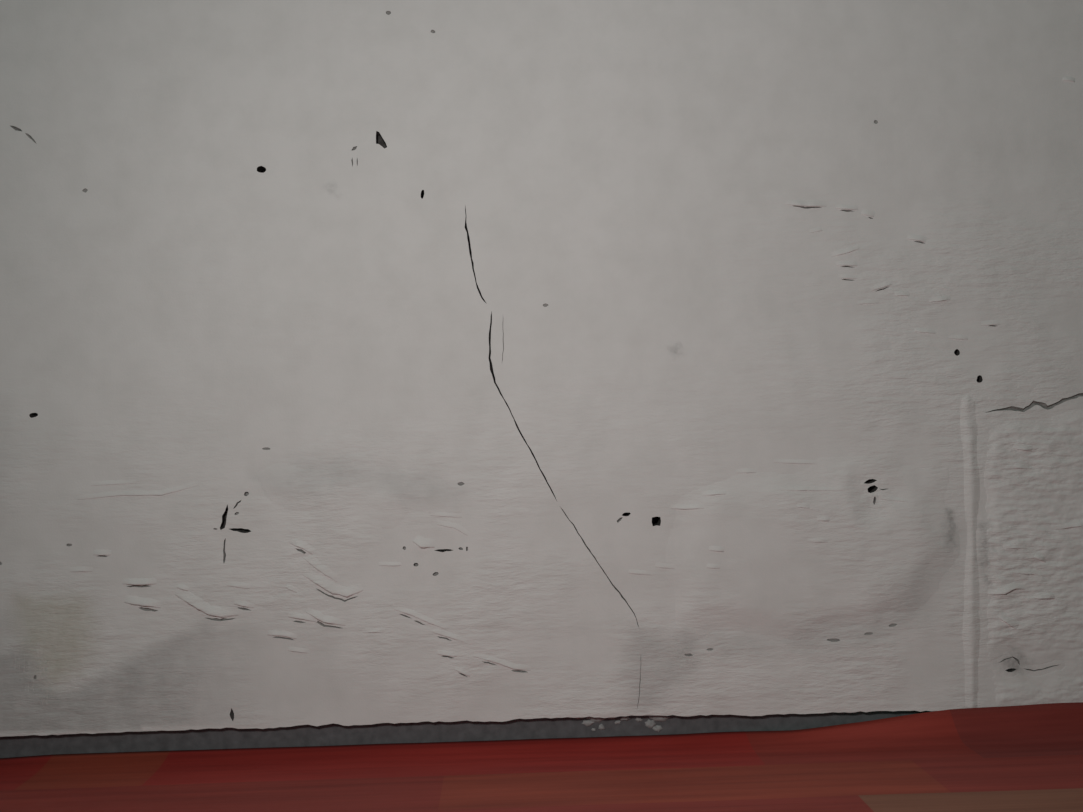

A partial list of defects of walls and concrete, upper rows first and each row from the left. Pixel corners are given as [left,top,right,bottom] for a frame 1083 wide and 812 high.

crack [465,206,640,629]
crack [989,393,1083,412]